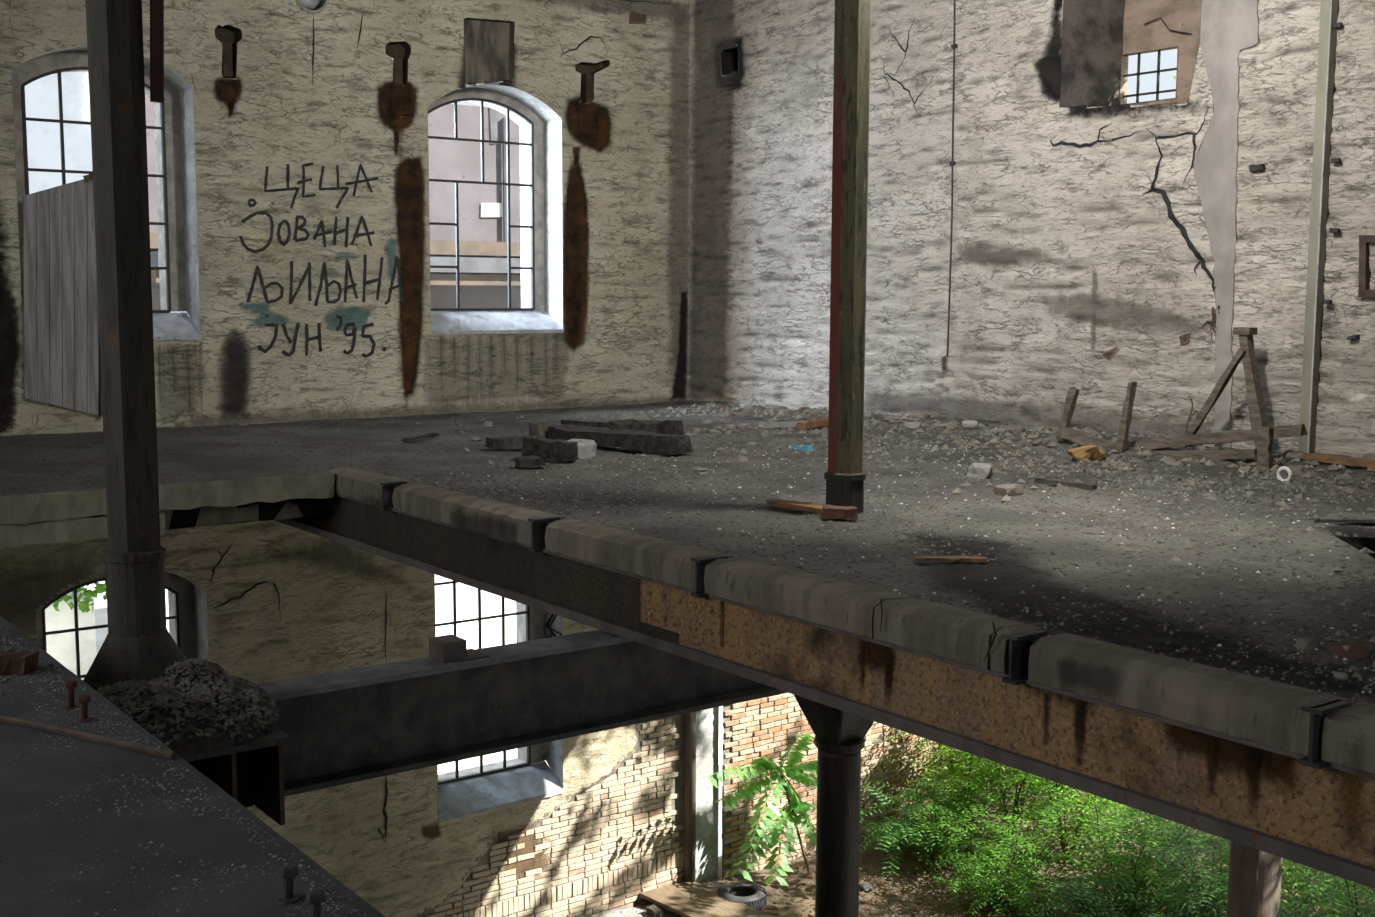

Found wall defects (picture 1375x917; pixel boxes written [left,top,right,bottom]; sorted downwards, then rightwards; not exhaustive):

crack [1050,106,1220,339]
leakage [0,290,21,432]
crack [209,542,281,614]
spalling [1339,537,1375,558]